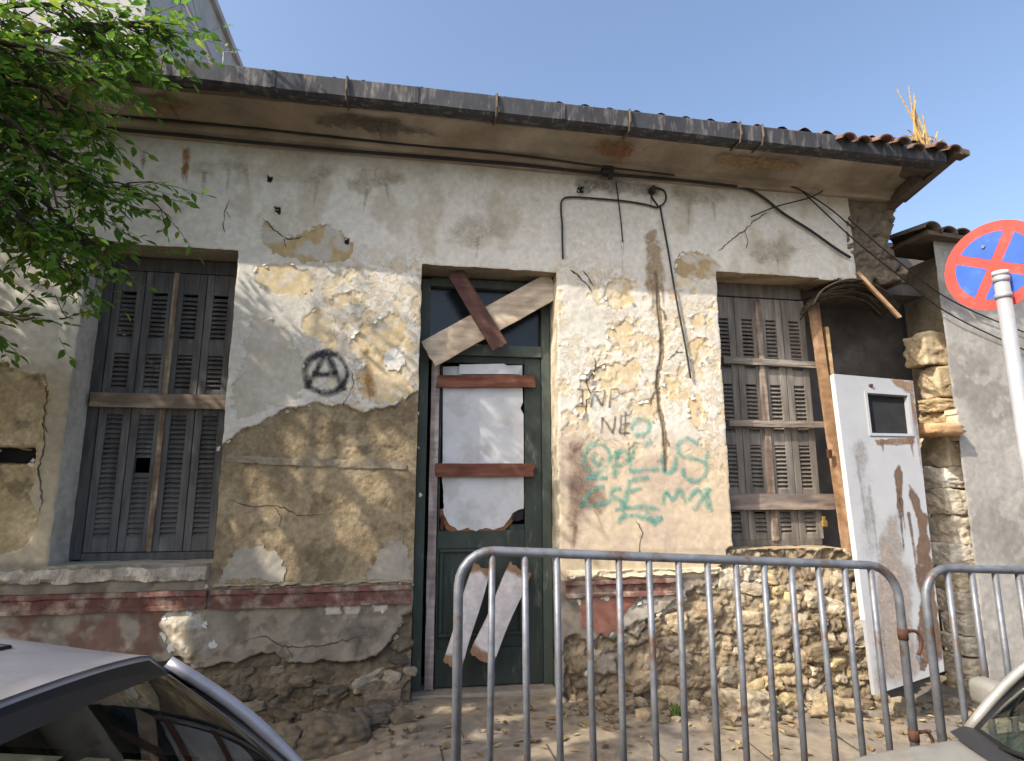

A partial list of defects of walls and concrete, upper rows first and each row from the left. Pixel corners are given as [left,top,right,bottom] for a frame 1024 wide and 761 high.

flaking render [253,207,353,297]
damp [646,230,664,302]
flaking render [674,251,721,281]
peeling [603,278,637,347]
peeling [573,358,643,420]
peeling [631,372,704,431]
rust [875,379,920,453]
flaking render [0,363,51,553]
crack [231,499,318,526]
flaking render [160,289,440,723]
rust [894,466,942,670]
crack [240,628,363,659]